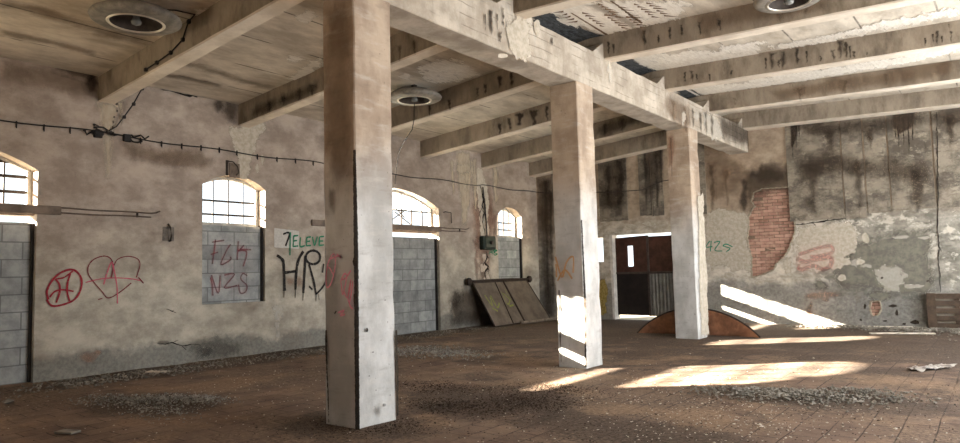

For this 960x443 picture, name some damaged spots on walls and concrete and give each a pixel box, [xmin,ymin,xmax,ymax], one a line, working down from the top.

peeling [498,16,540,62]
peeling [552,0,693,35]
water stain [765,48,808,68]
water stain [820,41,855,61]
water stain [603,160,625,211]
water stain [644,150,662,204]
water stain [791,113,960,209]
crack [480,186,489,278]
spalling [746,186,796,285]